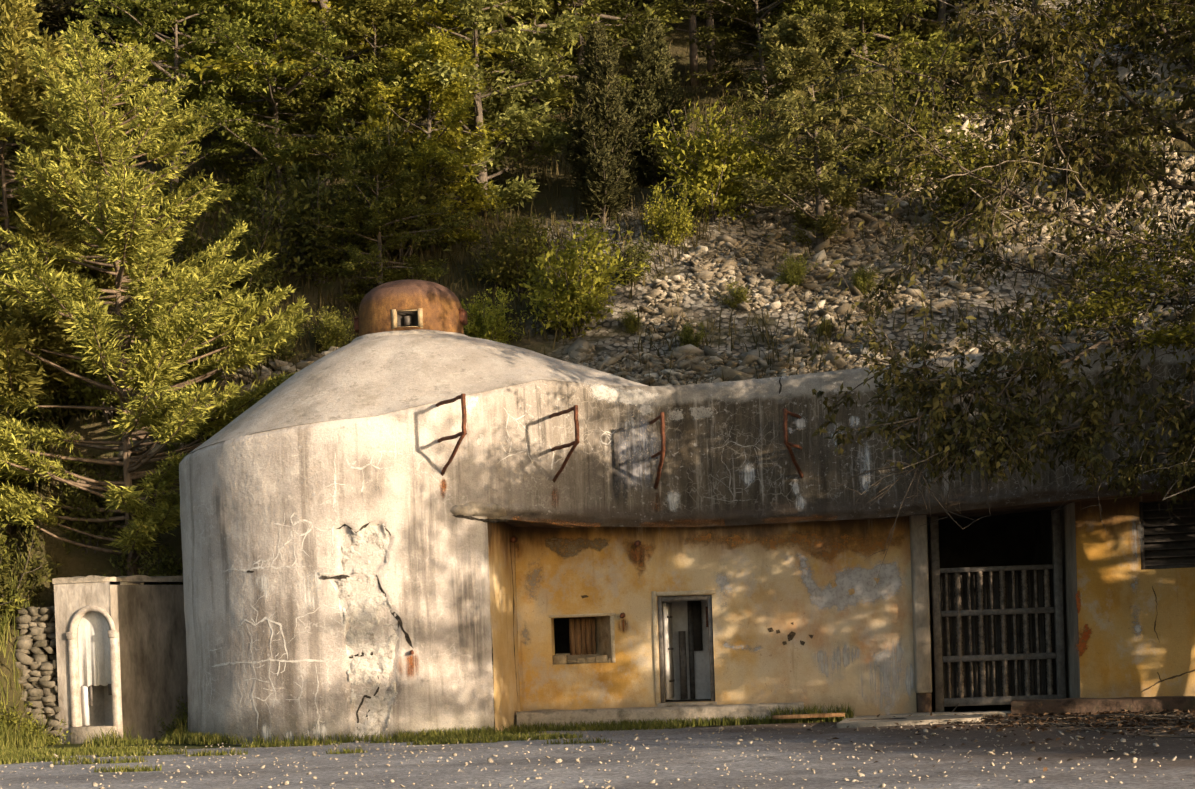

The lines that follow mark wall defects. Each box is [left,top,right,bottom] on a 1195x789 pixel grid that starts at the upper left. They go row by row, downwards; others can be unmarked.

leakage [453,396,478,428]
leakage [545,538,608,558]
leakage [685,531,903,560]
crack [203,450,401,731]
peeling [799,556,902,610]
crack [376,575,413,648]
spalling [318,522,399,738]
rust [400,650,418,675]
crack [1141,669,1195,692]